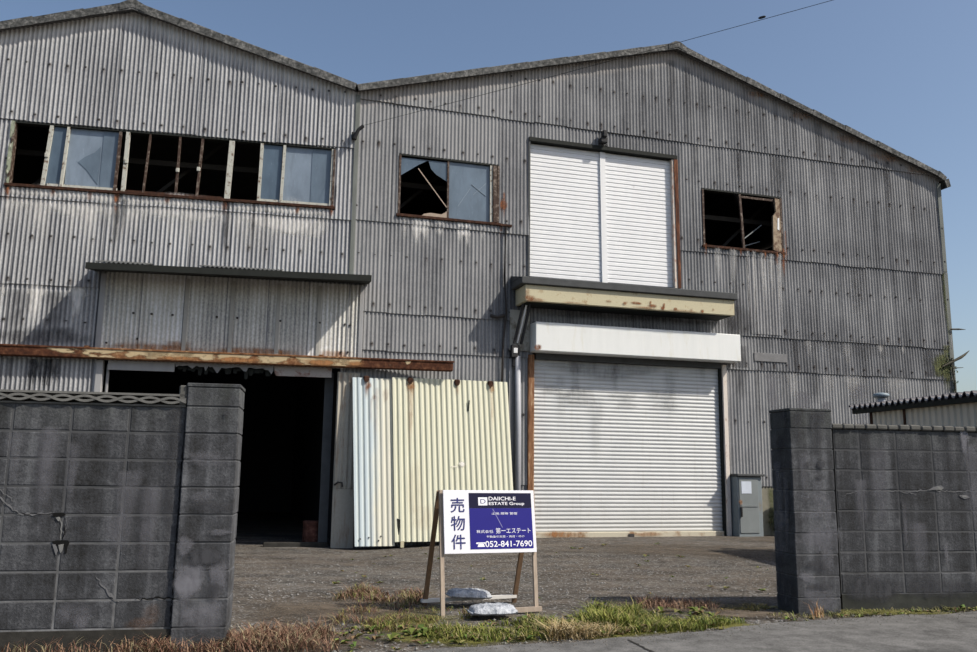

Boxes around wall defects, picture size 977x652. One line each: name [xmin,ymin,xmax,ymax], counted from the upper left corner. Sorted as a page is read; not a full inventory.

leakage [414,219,443,238]
leakage [458,223,470,241]
leakage [19,285,88,317]
corrosion [136,343,192,360]
corrosion [220,348,284,362]
corrosion [309,352,361,366]
leakage [29,359,60,389]
crack [0,489,68,539]
crack [96,416,186,624]